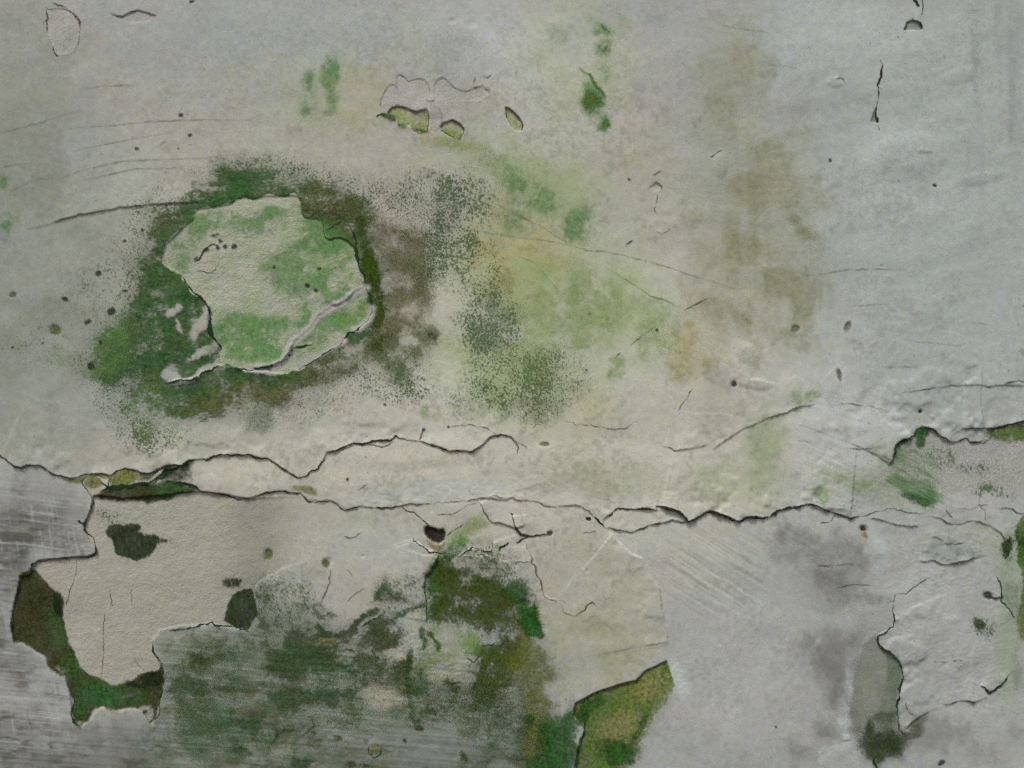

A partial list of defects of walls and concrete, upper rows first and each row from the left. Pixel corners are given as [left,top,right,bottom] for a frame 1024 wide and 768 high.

flaking render [376,74,490,139]
spalling [505,107,523,131]
crack [871,60,883,130]
flaking render [164,196,375,384]
damp [80,160,587,456]
crack [663,404,815,451]
crack [841,380,1024,412]
spalling [887,426,1012,506]
spalling [10,491,262,727]
damp [169,544,580,768]
crack [0,421,1024,734]
spalling [573,661,674,768]